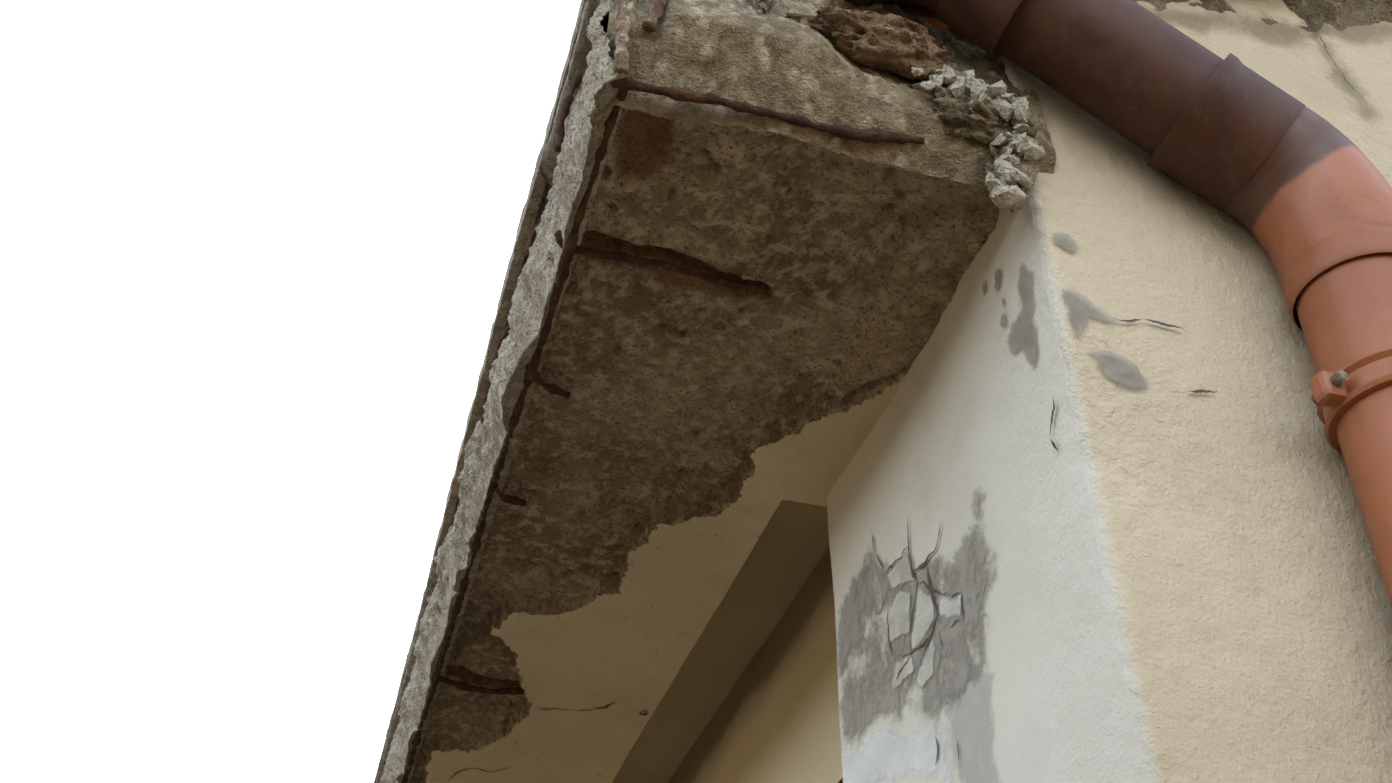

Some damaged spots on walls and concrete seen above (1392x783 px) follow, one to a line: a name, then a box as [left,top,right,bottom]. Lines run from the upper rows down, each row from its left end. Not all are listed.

corrosion [618,110,671,175]
corrosion [586,230,771,302]
spalling [380,0,1056,783]
crack [871,522,964,689]
corrosion [448,665,519,689]